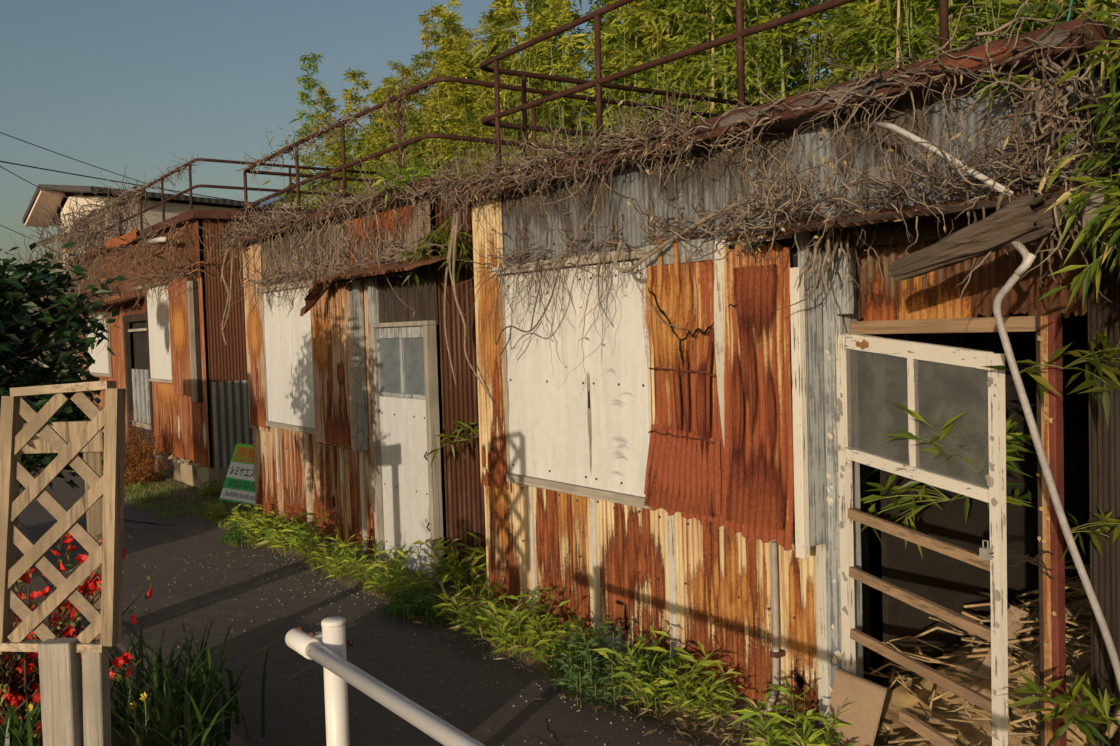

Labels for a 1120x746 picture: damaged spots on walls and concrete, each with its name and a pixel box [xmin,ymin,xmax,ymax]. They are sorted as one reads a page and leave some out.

corrosion [170,297,188,359]
corrosion [156,383,209,466]
corrosion [246,275,266,428]
corrosion [257,289,377,556]
corrosion [478,234,520,609]
corrosion [641,216,712,464]
corrosion [536,264,819,723]
peeling [826,465,845,505]
corrosion [863,266,974,321]